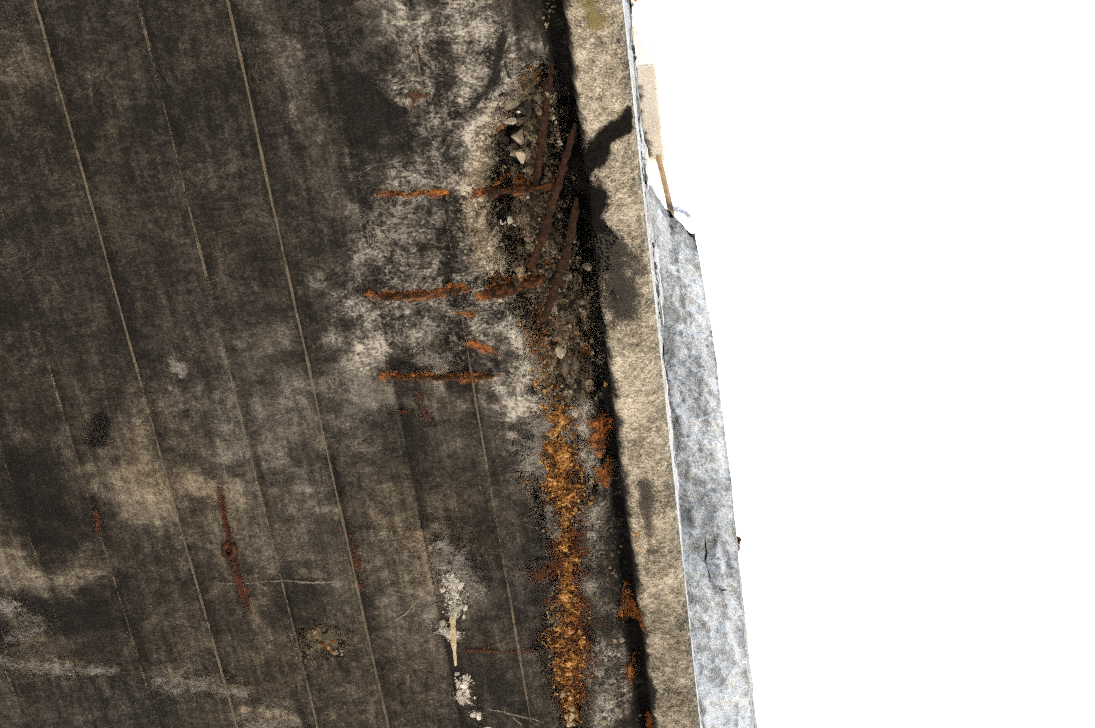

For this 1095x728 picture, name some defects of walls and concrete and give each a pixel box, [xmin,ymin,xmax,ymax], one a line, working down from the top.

corrosion [378,189,450,198]
corrosion [471,165,557,197]
corrosion [365,260,551,317]
spalling [375,59,608,482]
water stain [587,221,660,330]
corrosion [577,409,614,488]
corrosion [216,488,253,615]
water stain [429,540,484,641]
corrosion [535,453,597,715]
water stain [454,672,491,728]